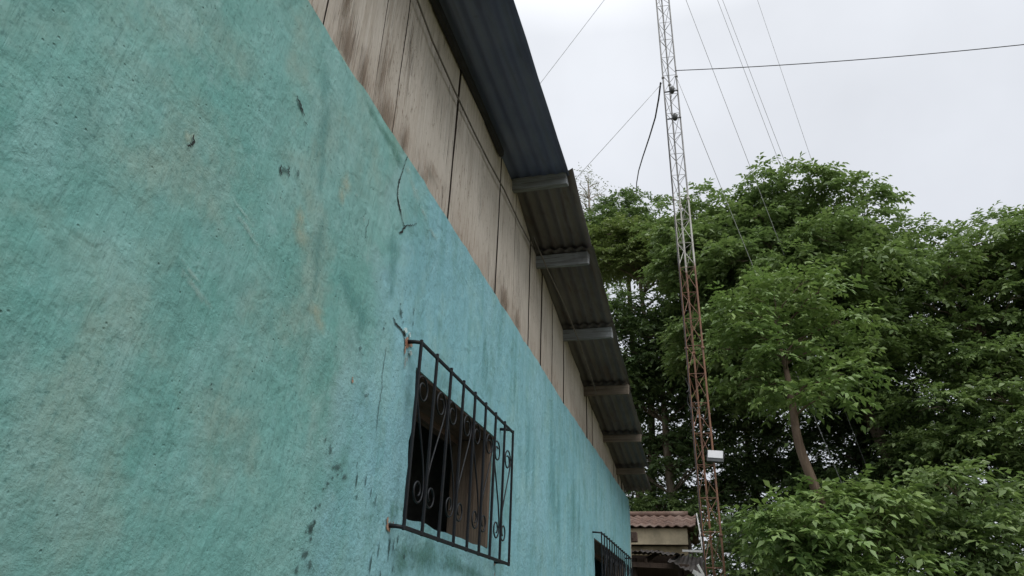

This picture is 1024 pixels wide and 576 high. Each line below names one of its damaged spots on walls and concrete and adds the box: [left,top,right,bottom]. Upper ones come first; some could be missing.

crack [397,156,417,234]
damp [323,437,377,505]
damp [295,504,321,573]